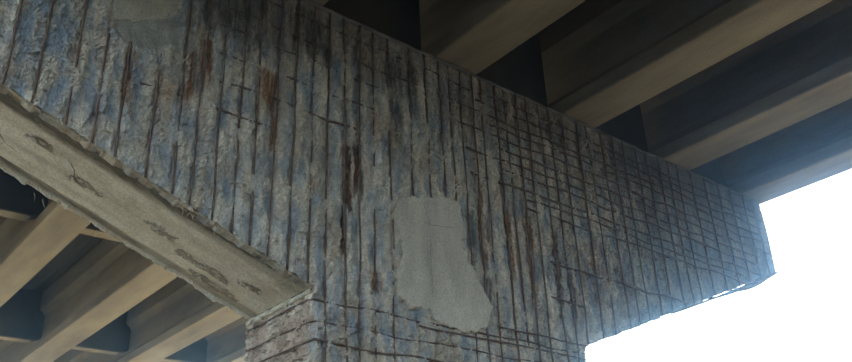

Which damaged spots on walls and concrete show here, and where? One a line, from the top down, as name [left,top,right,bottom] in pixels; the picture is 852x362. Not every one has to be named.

peeling [26,134,55,155]
peeling [69,176,102,197]
peeling [143,220,236,302]
spalling [244,295,324,362]